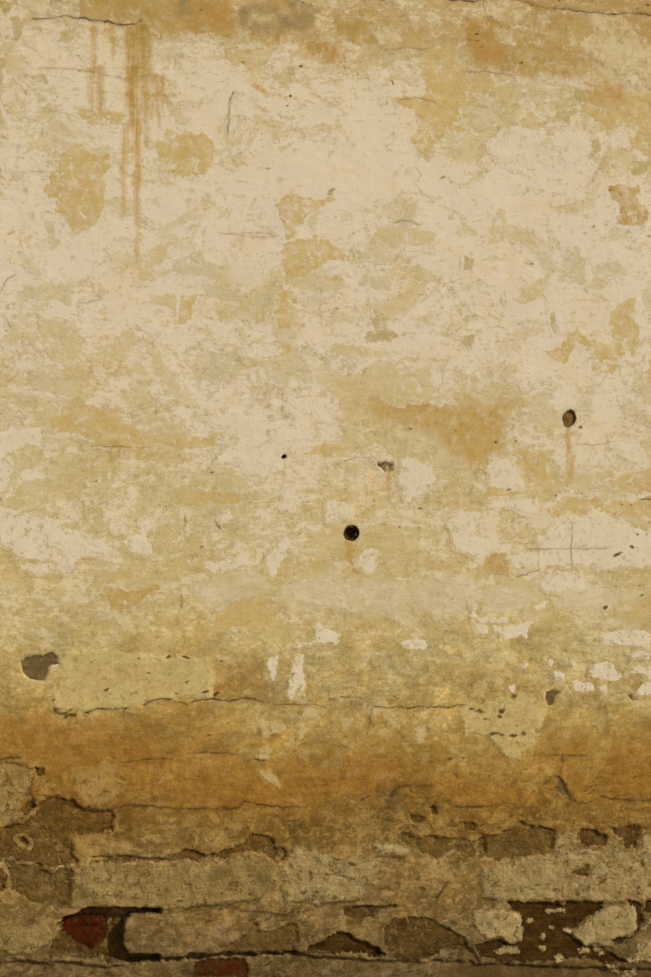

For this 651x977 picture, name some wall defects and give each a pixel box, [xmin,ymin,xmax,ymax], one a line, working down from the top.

peeling [0,0,287,52]
peeling [390,0,651,236]
peeling [0,309,159,579]
peeling [199,390,439,506]
flaking render [21,652,57,680]
crack [54,697,295,716]
leakage [0,648,651,840]
peeling [179,440,651,791]
flaking render [0,756,290,970]
flaking render [373,801,559,865]
flaking render [569,819,648,880]
flaking render [193,888,651,977]